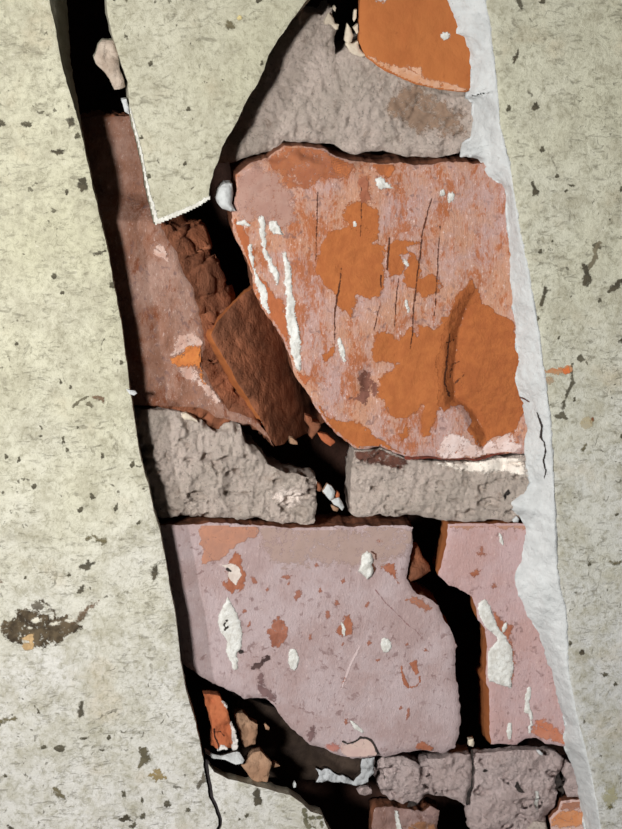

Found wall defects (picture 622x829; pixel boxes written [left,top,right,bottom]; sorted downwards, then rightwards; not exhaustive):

spalling [130,108,210,225]
peeling [269,148,443,318]
peeling [234,219,312,385]
peeling [170,345,206,387]
peeling [304,406,406,454]
flaking render [350,0,601,829]
peeling [316,481,344,511]
peeling [198,525,259,594]
spalling [267,616,288,648]
peeling [335,614,354,646]
peeling [326,739,377,757]
crack [196,759,222,829]